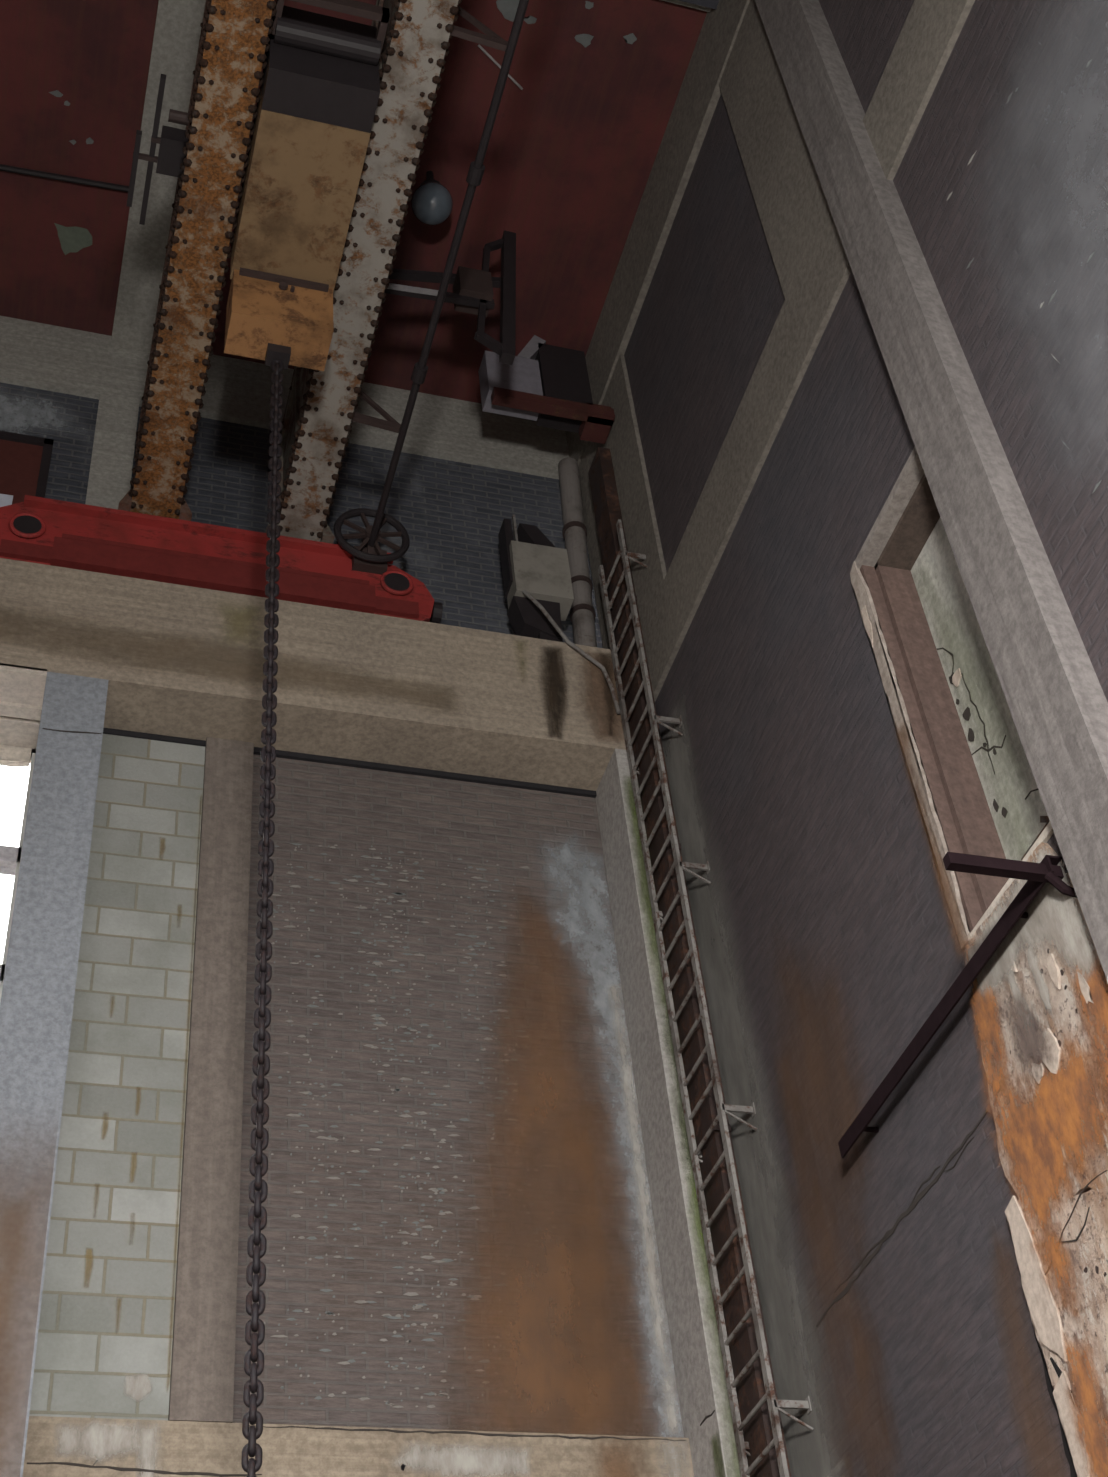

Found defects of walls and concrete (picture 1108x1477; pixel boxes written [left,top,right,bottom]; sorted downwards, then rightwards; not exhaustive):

peeling [496,0,537,24]
peeling [574,34,594,47]
peeling [54,223,92,255]
corrosion [861,605,873,647]
corrosion [936,856,1108,1304]
damp [264,843,530,1408]
damp [549,842,684,1477]
flaking render [981,842,1108,1477]
corrosion [1065,1338,1108,1477]
crack [27,1459,262,1477]
damp [402,1446,526,1476]